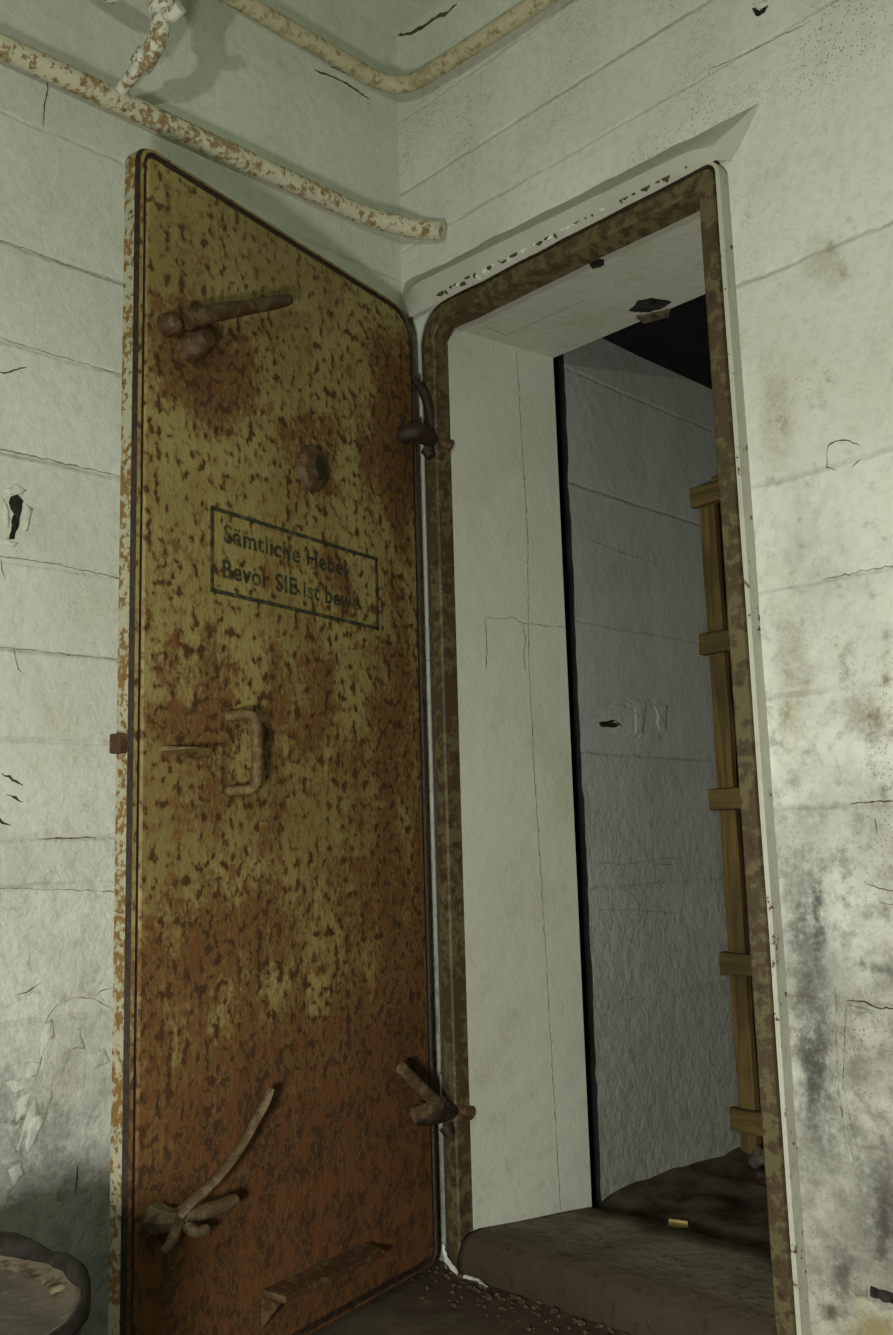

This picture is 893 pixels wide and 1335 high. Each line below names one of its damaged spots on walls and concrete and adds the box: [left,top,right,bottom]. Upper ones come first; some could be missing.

spalling [2,483,32,547]